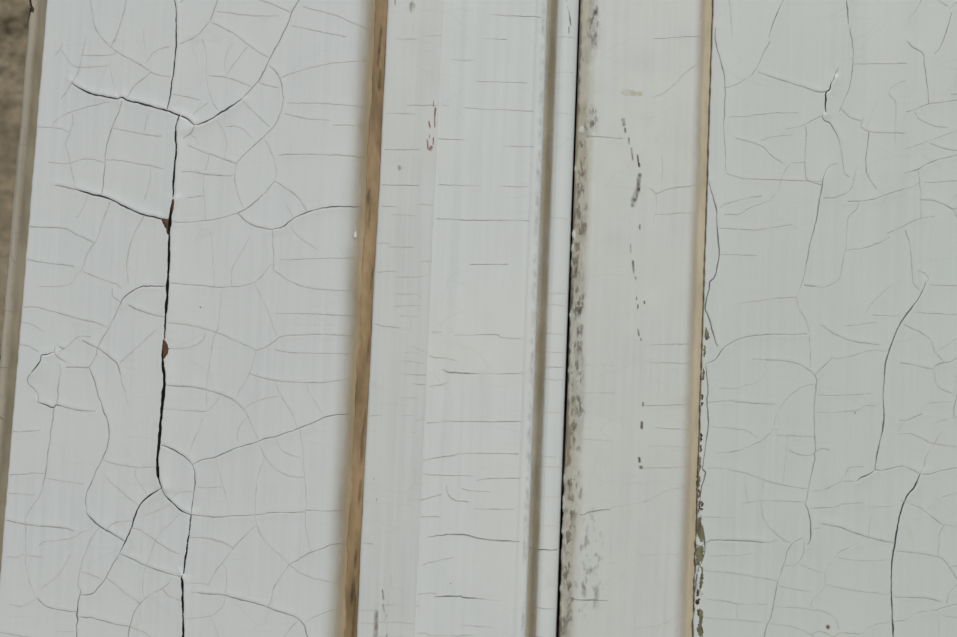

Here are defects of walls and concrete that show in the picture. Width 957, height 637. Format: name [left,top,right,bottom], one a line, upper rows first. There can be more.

crack [382,184,571,221]
crack [0,0,373,637]
crack [371,270,523,433]
crack [567,0,957,637]
crack [360,592,500,637]
crack [413,452,560,565]
peeling [695,433,704,637]